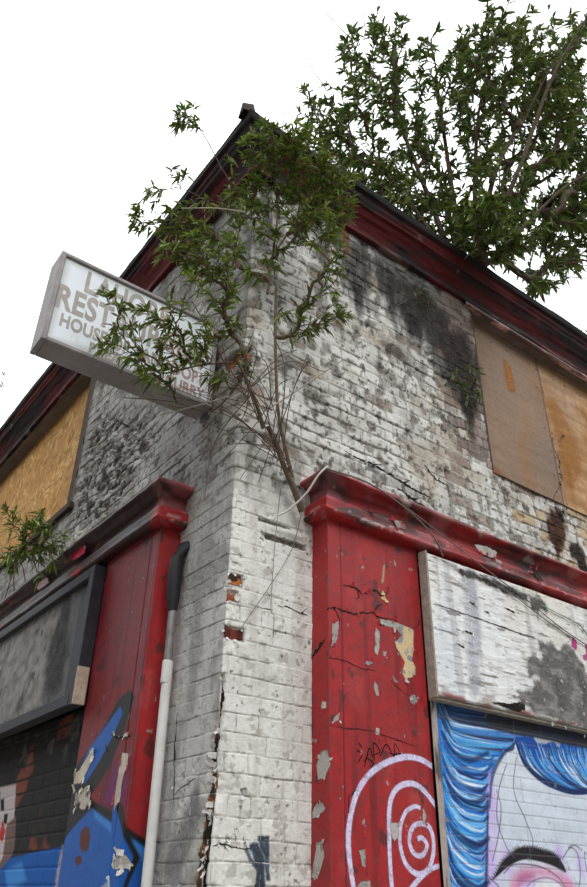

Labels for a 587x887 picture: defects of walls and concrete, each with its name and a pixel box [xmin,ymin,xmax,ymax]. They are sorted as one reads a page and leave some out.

flaking render [223,571,242,602]
flaking render [221,621,243,643]
peeling [365,618,416,684]
water stain [519,641,587,737]
peeling [72,748,94,814]
peeling [111,752,128,810]
crack [171,677,250,887]
peeling [106,847,134,887]